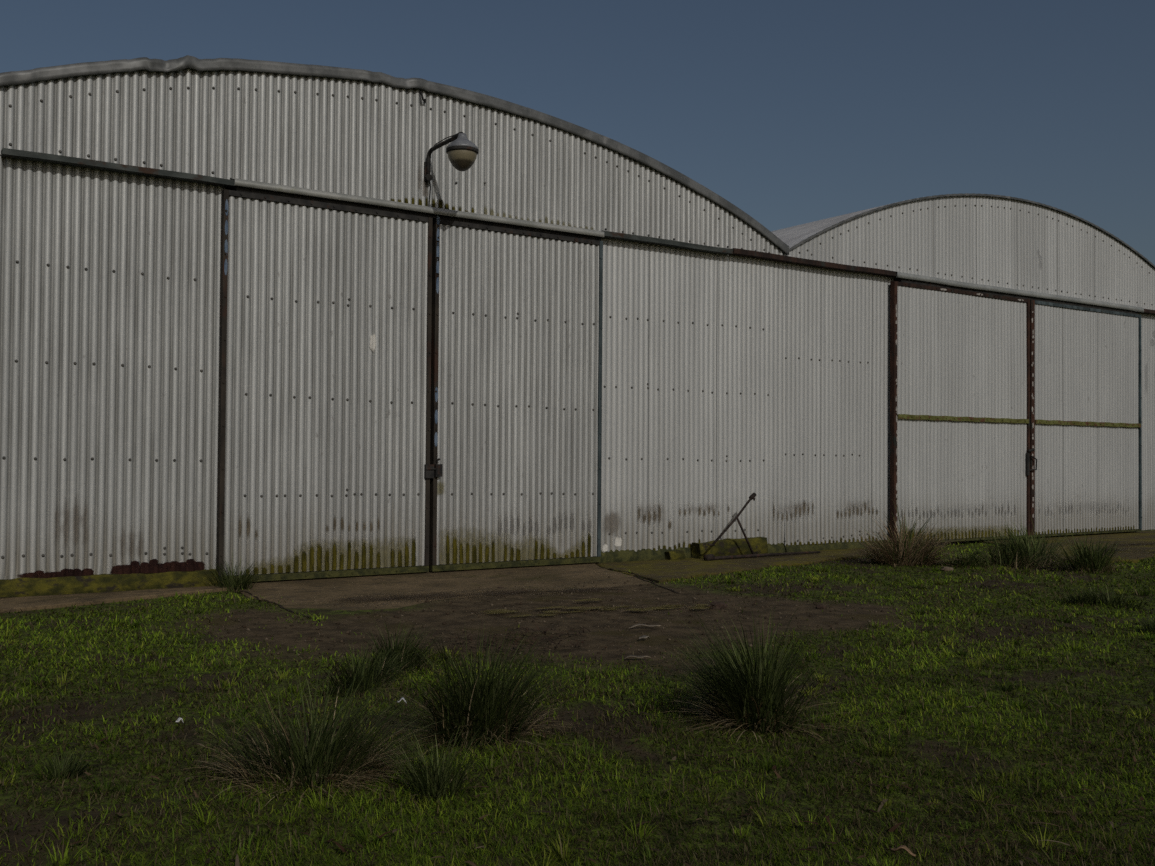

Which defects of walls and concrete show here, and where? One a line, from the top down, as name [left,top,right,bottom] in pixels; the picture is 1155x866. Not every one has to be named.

water stain [326,518,379,531]
water stain [638,507,729,528]
corrosion [18,568,94,578]
corrosion [110,559,205,574]